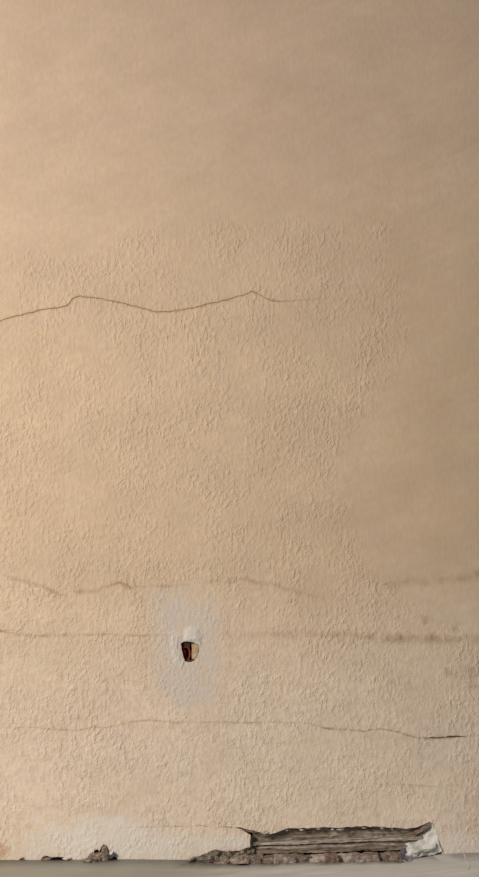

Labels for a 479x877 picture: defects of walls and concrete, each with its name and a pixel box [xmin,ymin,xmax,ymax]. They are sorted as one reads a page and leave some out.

crack [0,291,313,322]
flaking render [188,822,442,865]